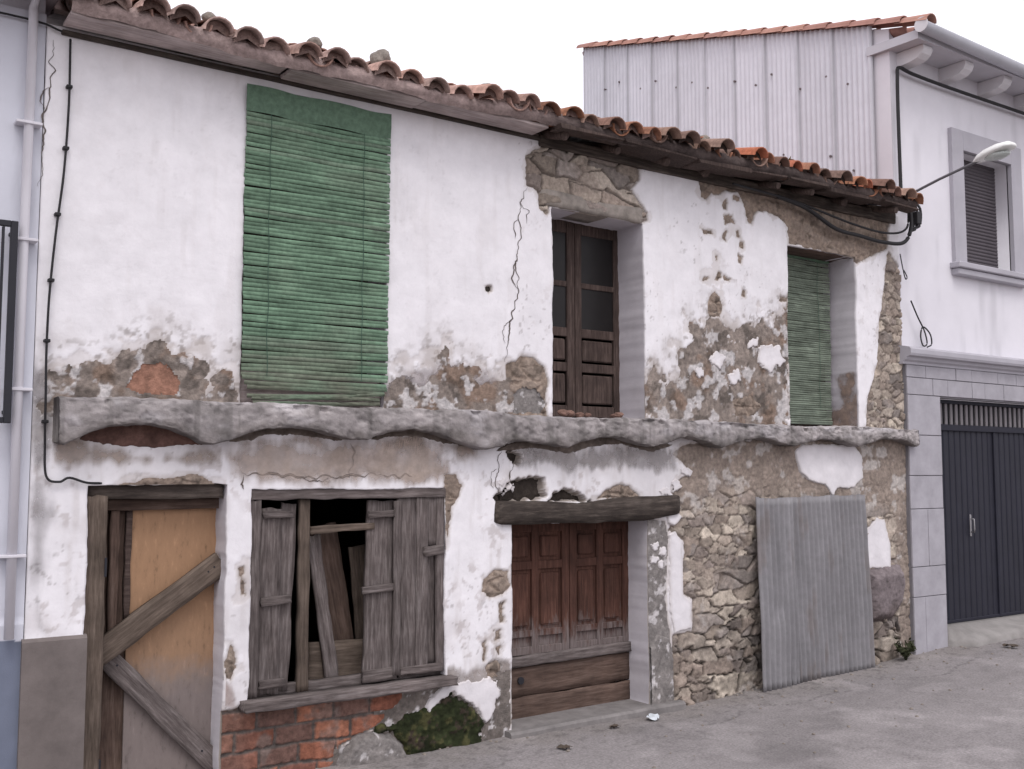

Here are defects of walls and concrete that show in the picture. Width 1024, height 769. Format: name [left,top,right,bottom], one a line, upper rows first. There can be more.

spalling [525,147,647,224]
crack [502,190,530,355]
peeling [36,339,239,417]
peeling [384,345,547,416]
crack [240,445,411,489]
spalling [493,182,911,706]
spalling [220,570,511,769]